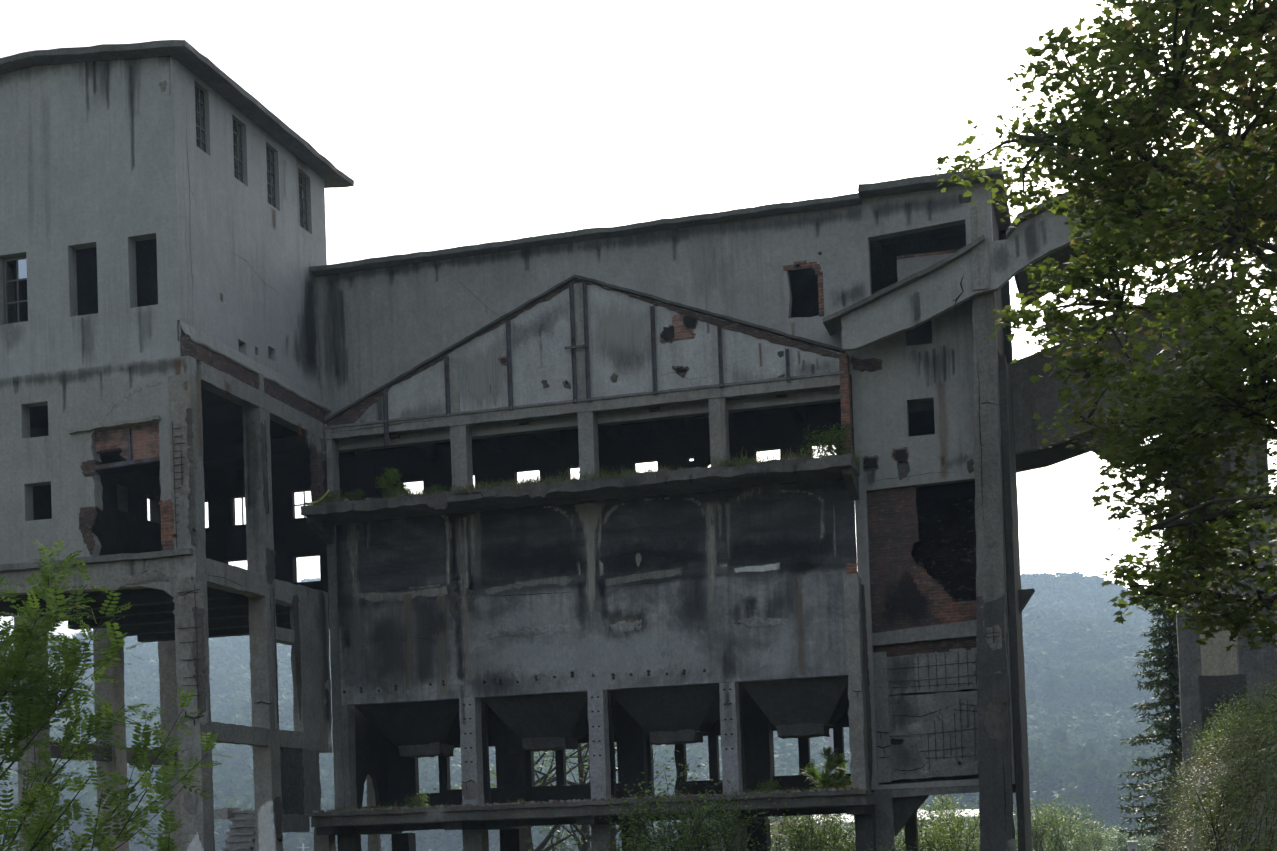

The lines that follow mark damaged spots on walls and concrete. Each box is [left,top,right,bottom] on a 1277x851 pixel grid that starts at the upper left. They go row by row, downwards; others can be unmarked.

damp [305,282,316,368]
flaking render [660,314,698,343]
flaking render [80,460,96,477]
flaking render [79,506,101,555]
damp [345,512,480,679]
damp [487,503,681,616]
damp [644,488,780,610]